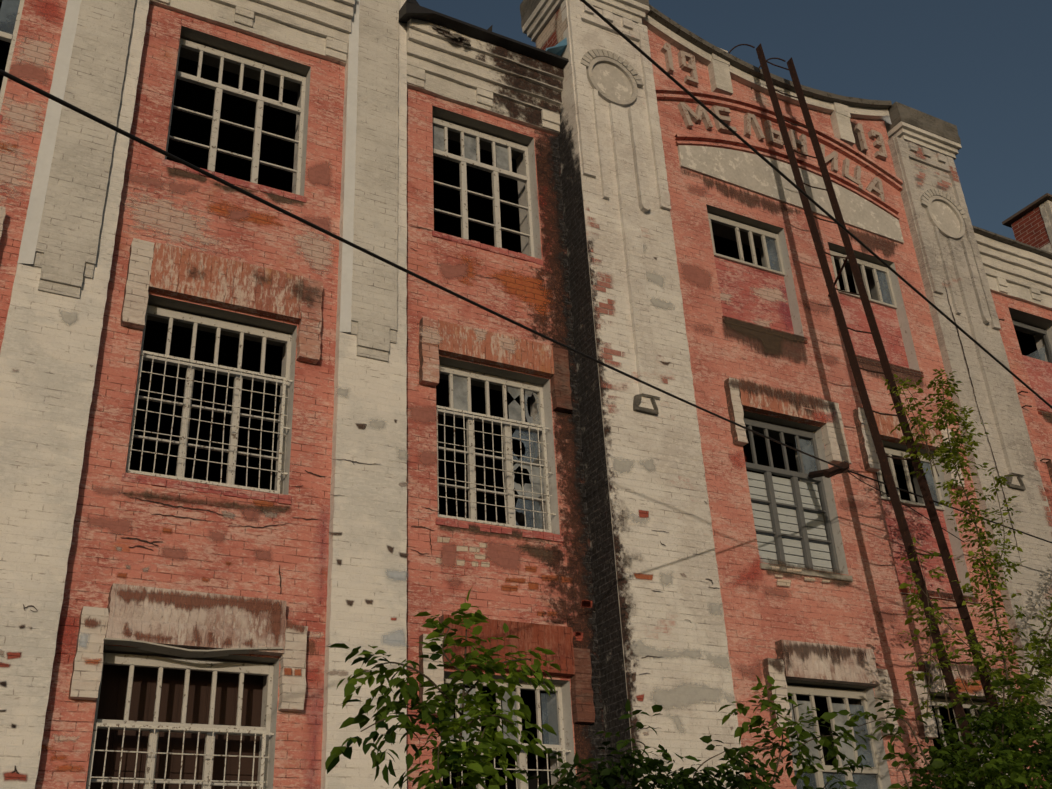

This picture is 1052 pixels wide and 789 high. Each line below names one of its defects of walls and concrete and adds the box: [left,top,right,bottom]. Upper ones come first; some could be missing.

peeling [590,250,615,326]
damp [420,326,443,344]
peeling [602,343,624,367]
damp [728,378,835,422]
damp [440,44,640,789]
spalling [623,557,653,580]
peeling [0,650,21,667]
damp [766,642,866,672]
spalling [4,771,27,781]